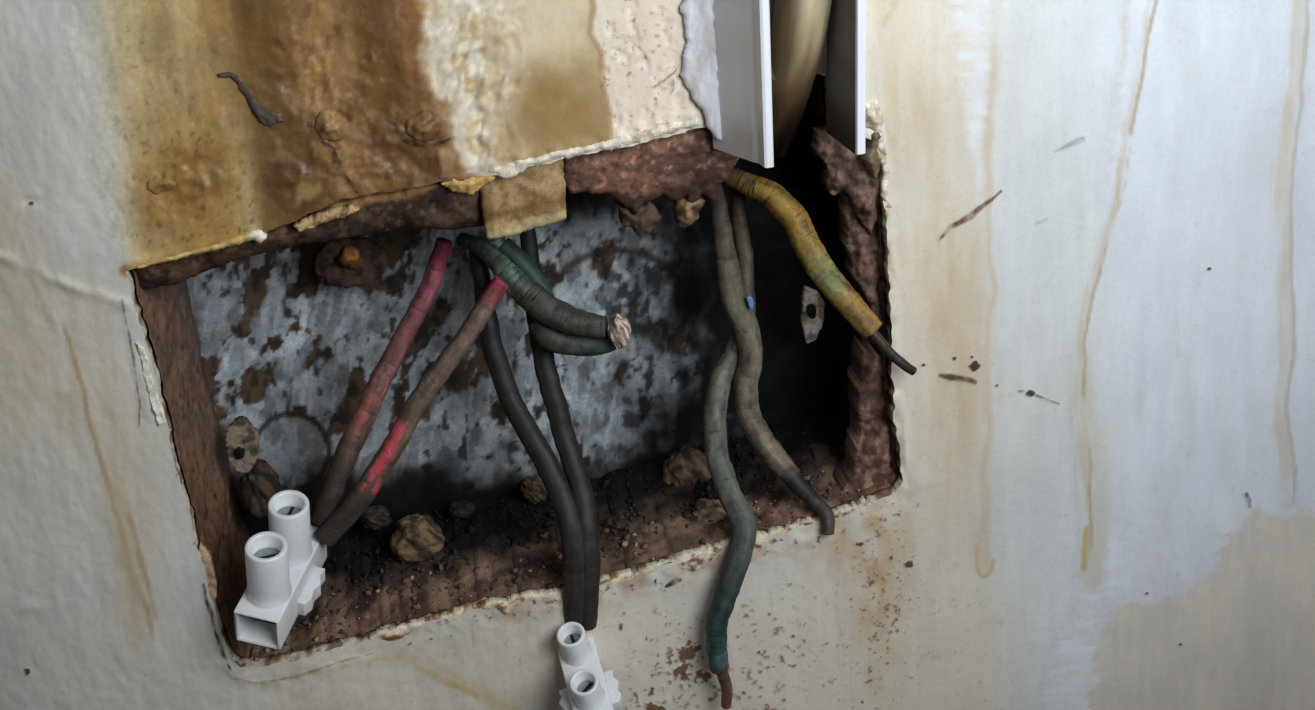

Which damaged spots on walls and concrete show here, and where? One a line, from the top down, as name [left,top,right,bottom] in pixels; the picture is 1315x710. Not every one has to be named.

corrosion [53,0,480,269]
leakage [1069,0,1160,586]
leakage [1270,0,1313,511]
corrosion [472,597,565,649]
corrosion [597,550,728,625]
corrosion [746,483,927,710]